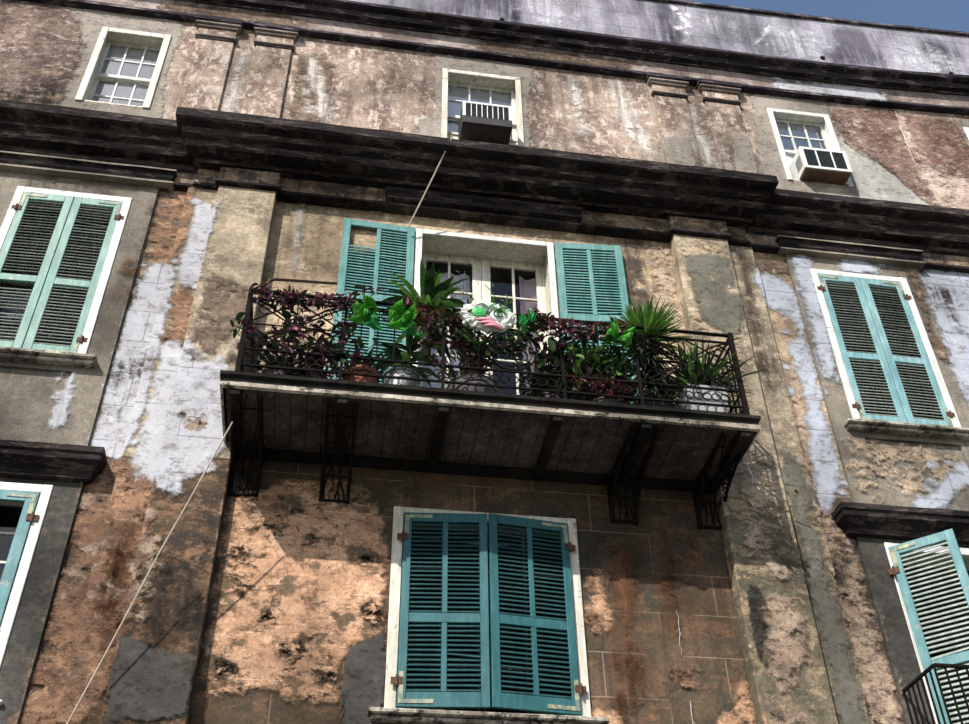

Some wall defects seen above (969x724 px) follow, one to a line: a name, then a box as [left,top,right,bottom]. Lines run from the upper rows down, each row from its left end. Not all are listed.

leakage [451,0,586,26]
leakage [657,3,680,42]
leakage [690,11,741,37]
leakage [764,24,965,74]
peeling [829,91,969,210]
peeling [141,187,202,270]
peeling [755,252,791,280]
peeling [159,272,248,364]
peeling [908,269,949,363]
peeling [177,409,207,431]
peeling [837,437,958,502]
peeling [735,354,903,724]